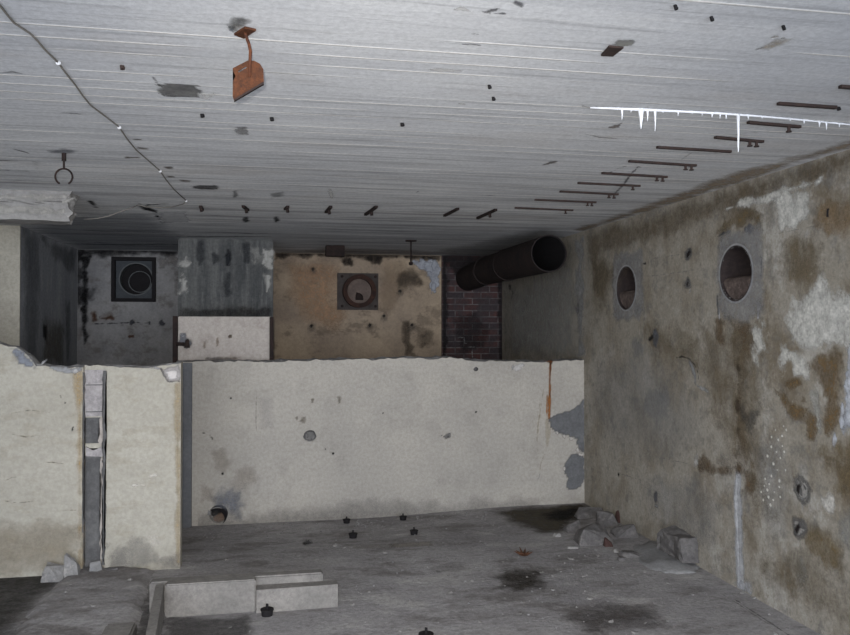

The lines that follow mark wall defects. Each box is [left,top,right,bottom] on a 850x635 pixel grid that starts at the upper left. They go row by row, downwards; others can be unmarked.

damp [398,271,422,286]
peeling [412,259,441,294]
damp [403,321,413,354]
spalling [13,349,81,373]
efflorescence [832,346,850,447]
peeling [549,400,584,489]
damp [694,296,759,594]
hole [794,475,810,505]
hole [793,518,807,539]